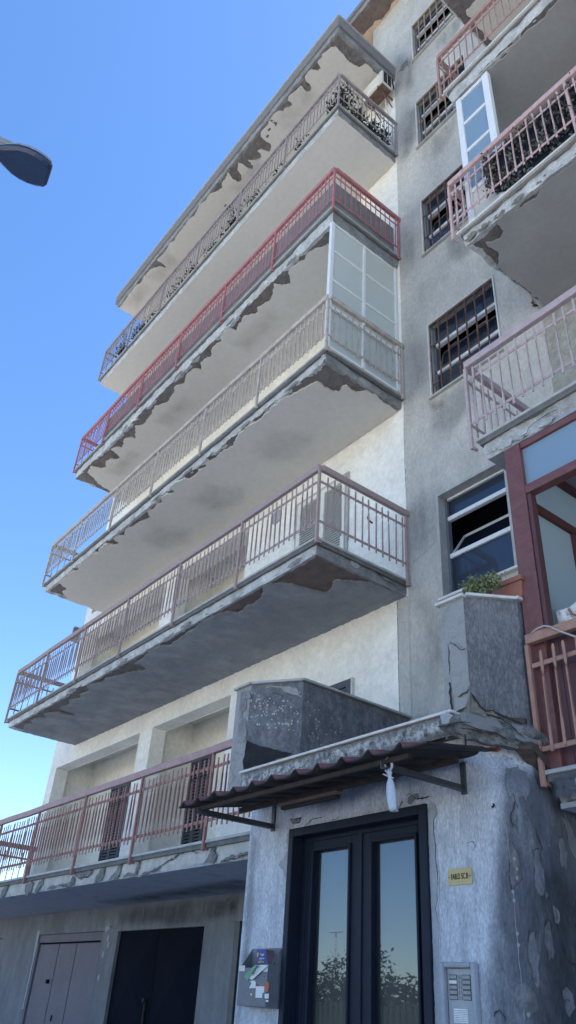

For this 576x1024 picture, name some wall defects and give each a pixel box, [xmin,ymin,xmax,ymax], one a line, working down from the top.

spalling [323,36,376,72]
spalling [444,0,492,46]
spalling [478,0,557,75]
spalling [214,79,311,191]
spalling [464,174,546,299]
spalling [76,231,330,488]
spalling [71,353,399,570]
spalling [160,556,396,645]
spalling [14,653,147,729]
crack [448,647,533,726]
spalling [437,711,550,752]
peeling [509,841,560,988]